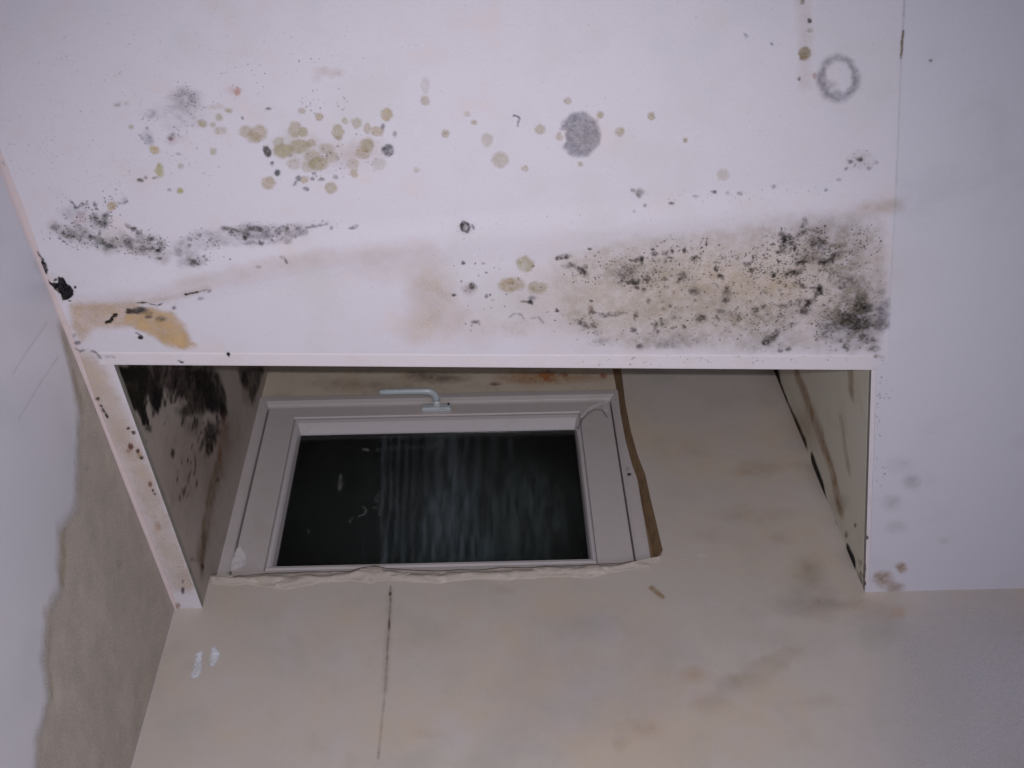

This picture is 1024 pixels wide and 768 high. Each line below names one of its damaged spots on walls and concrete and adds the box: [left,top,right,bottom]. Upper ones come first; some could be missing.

mould [263,129,306,157]
mould [365,109,393,155]
mould [556,225,887,348]
leakage [105,302,190,348]
mould [240,367,263,402]
leakage [119,361,226,484]